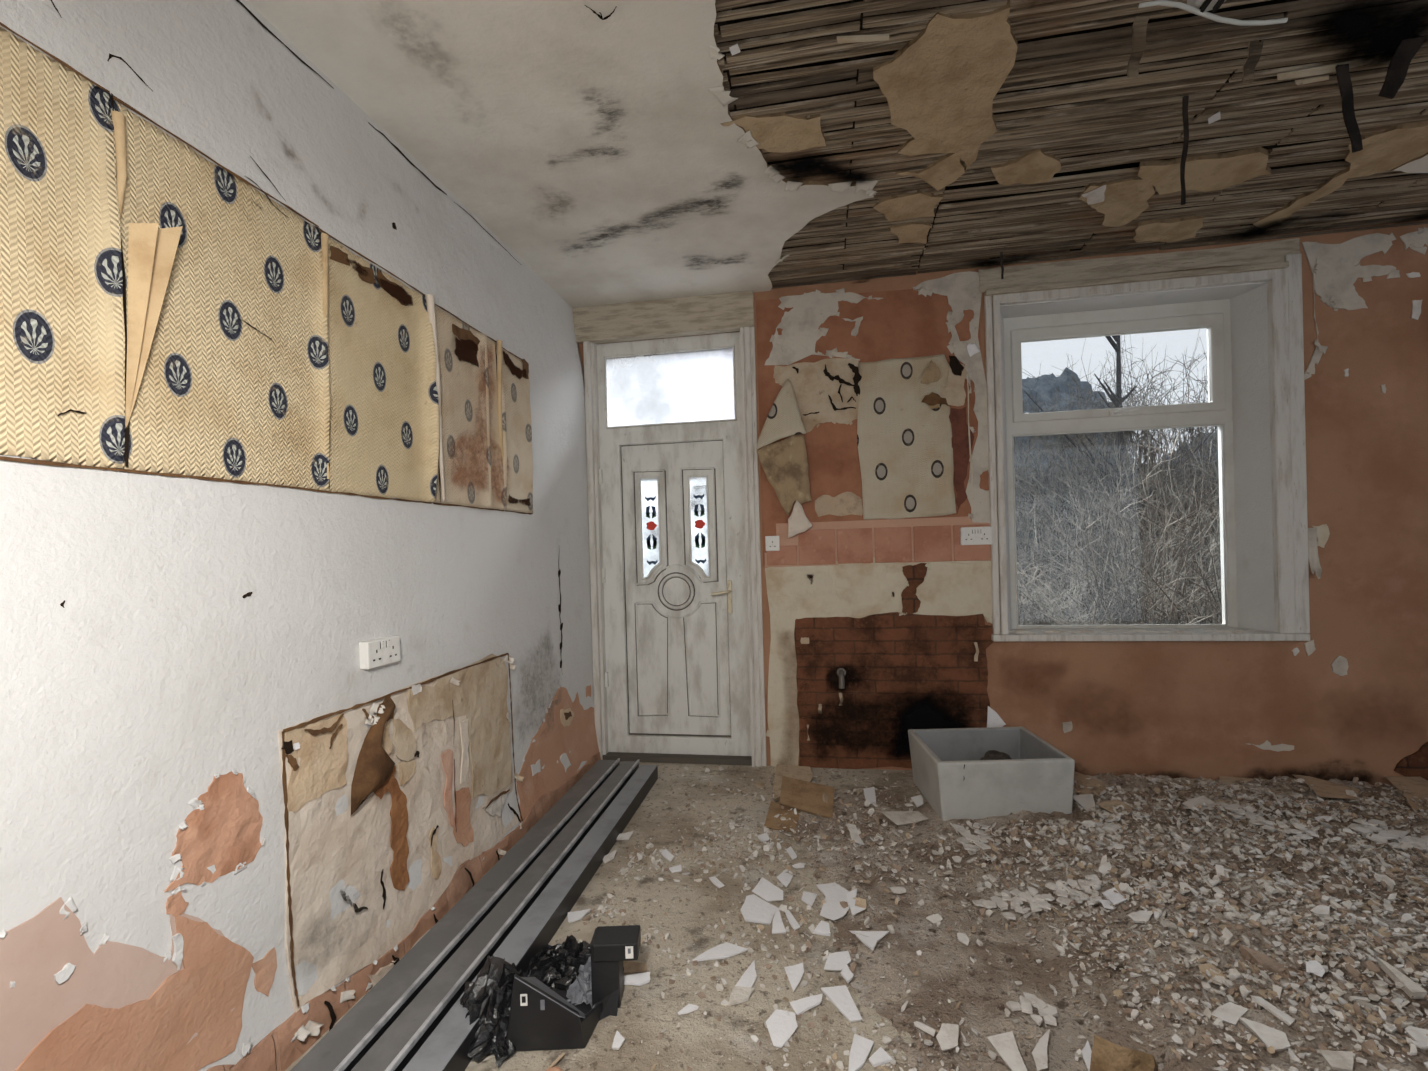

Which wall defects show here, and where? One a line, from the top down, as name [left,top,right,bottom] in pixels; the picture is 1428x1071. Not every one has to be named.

damp [574,180,739,249]
peeling [765,288,883,365]
peeling [913,271,997,523]
peeling [1301,227,1428,380]
flaking render [794,563,1027,769]
flaking render [1394,742,1428,780]
flaking render [0,685,601,1071]